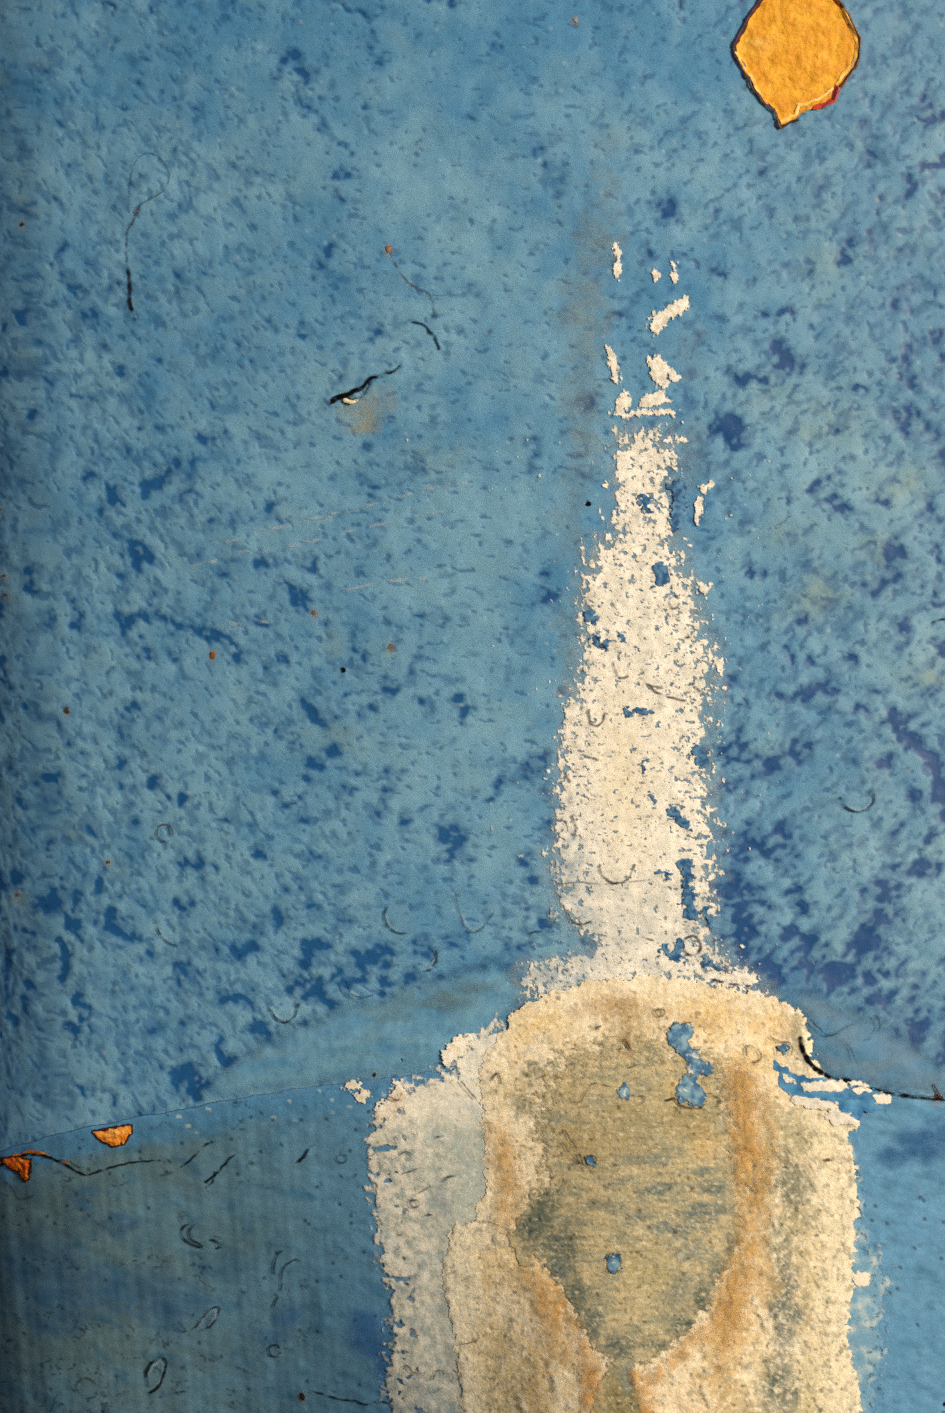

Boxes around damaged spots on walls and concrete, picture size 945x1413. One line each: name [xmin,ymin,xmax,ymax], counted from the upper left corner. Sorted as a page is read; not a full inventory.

peeling [732,0,862,129]
peeling [611,242,622,281]
peeling [646,261,690,337]
crack [330,366,400,404]
spalling [341,344,894,1413]
crack [798,1017,945,1101]
peeling [0,1155,32,1183]
peeling [92,1123,133,1148]